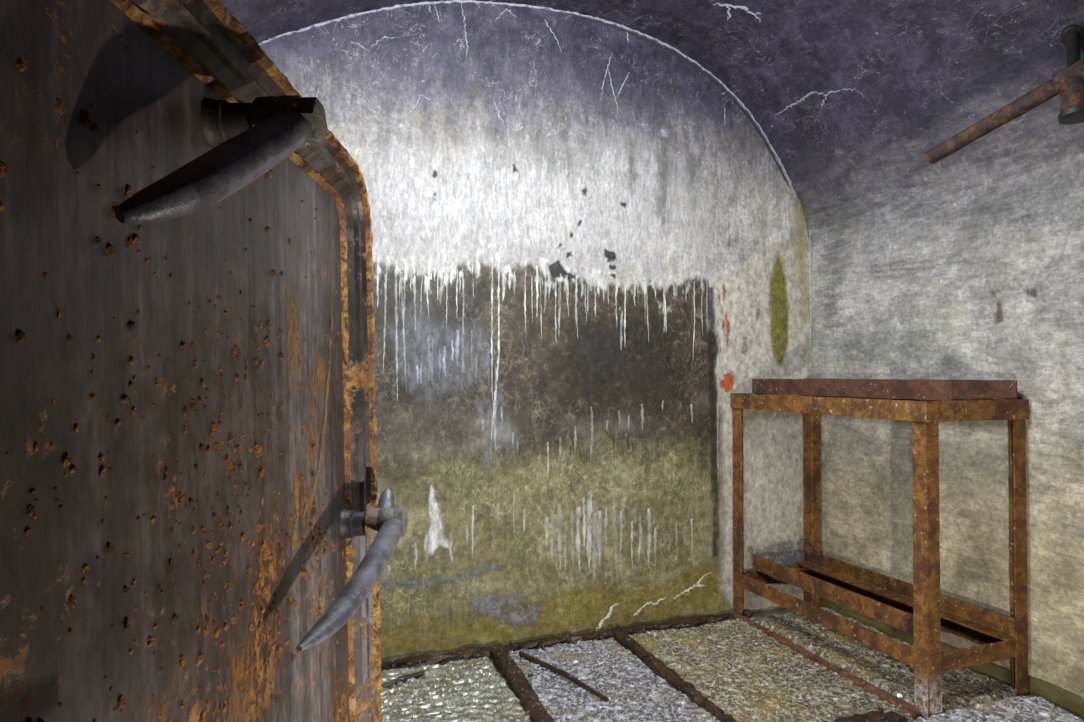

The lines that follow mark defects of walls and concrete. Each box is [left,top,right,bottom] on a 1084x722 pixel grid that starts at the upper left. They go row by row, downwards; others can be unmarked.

crack [258,0,864,187]
corrosion [95,225,172,278]
corrosion [108,355,144,426]
corrosion [145,300,338,722]
water stain [372,261,1084,722]
corrosion [111,607,159,654]
crack [596,573,709,631]